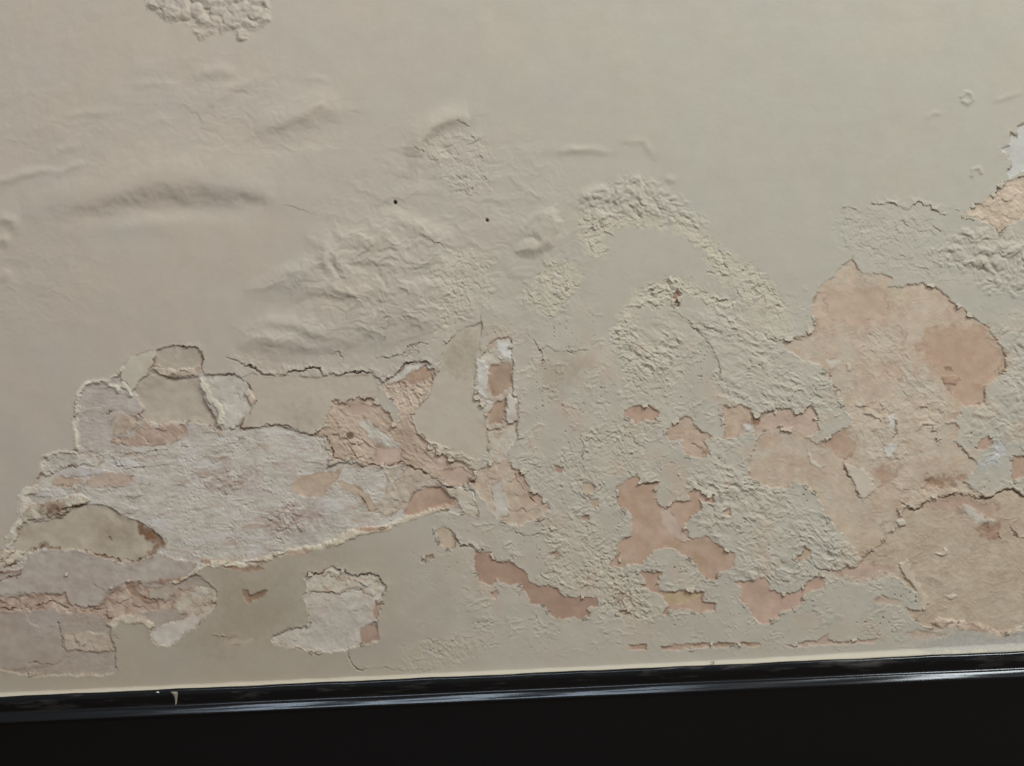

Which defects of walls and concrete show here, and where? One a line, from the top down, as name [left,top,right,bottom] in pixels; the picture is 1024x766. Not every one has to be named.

peeling [0,125,1024,677]